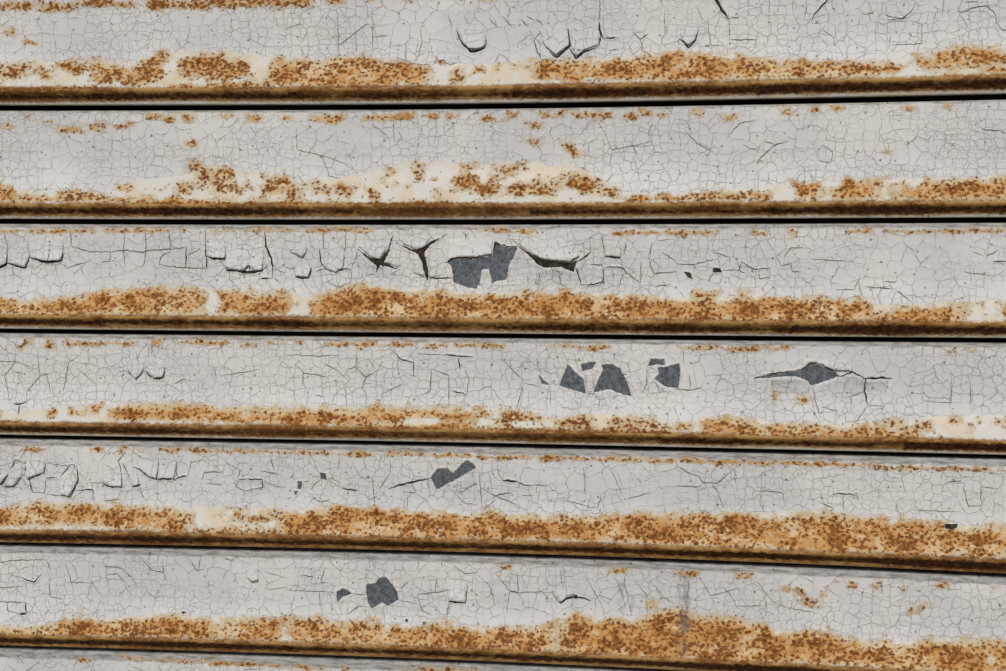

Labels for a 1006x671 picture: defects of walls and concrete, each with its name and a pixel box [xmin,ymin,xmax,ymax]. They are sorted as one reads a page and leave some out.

crack [596,0,665,57]
crack [712,0,757,47]
corrosion [0,45,1006,148]
corrosion [0,139,1006,235]
crack [65,231,208,269]
peeling [285,233,621,292]
crack [286,349,473,407]
peeling [507,349,700,412]
peeling [751,359,890,421]
corrosion [0,500,1006,591]
peeling [246,565,478,627]
corrosion [0,597,1006,671]